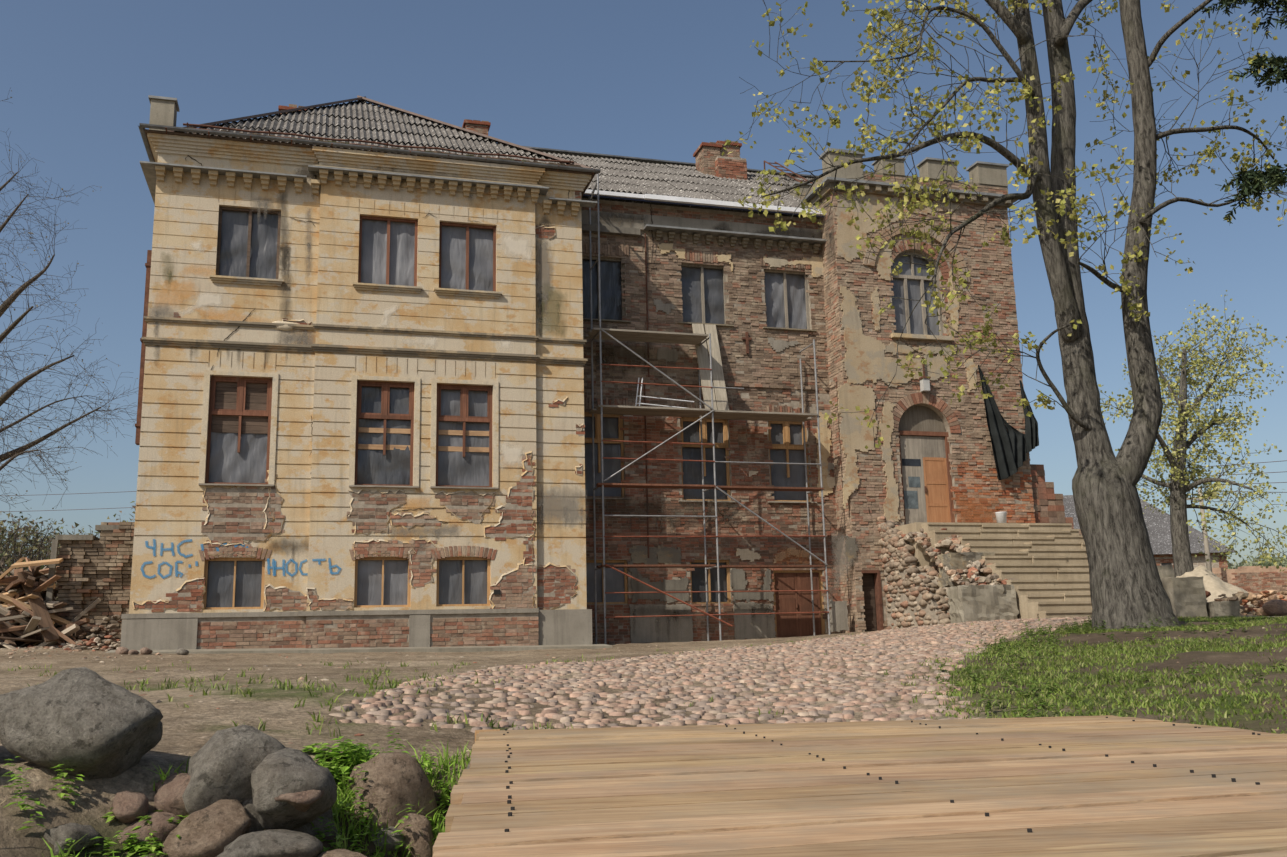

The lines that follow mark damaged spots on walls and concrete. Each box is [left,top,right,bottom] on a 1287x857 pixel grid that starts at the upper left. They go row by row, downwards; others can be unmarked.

water stain [537,242,563,332]
peeling [763,194,978,522]
spalling [201,470,285,558]
spalling [347,444,578,610]
spalling [132,578,206,612]